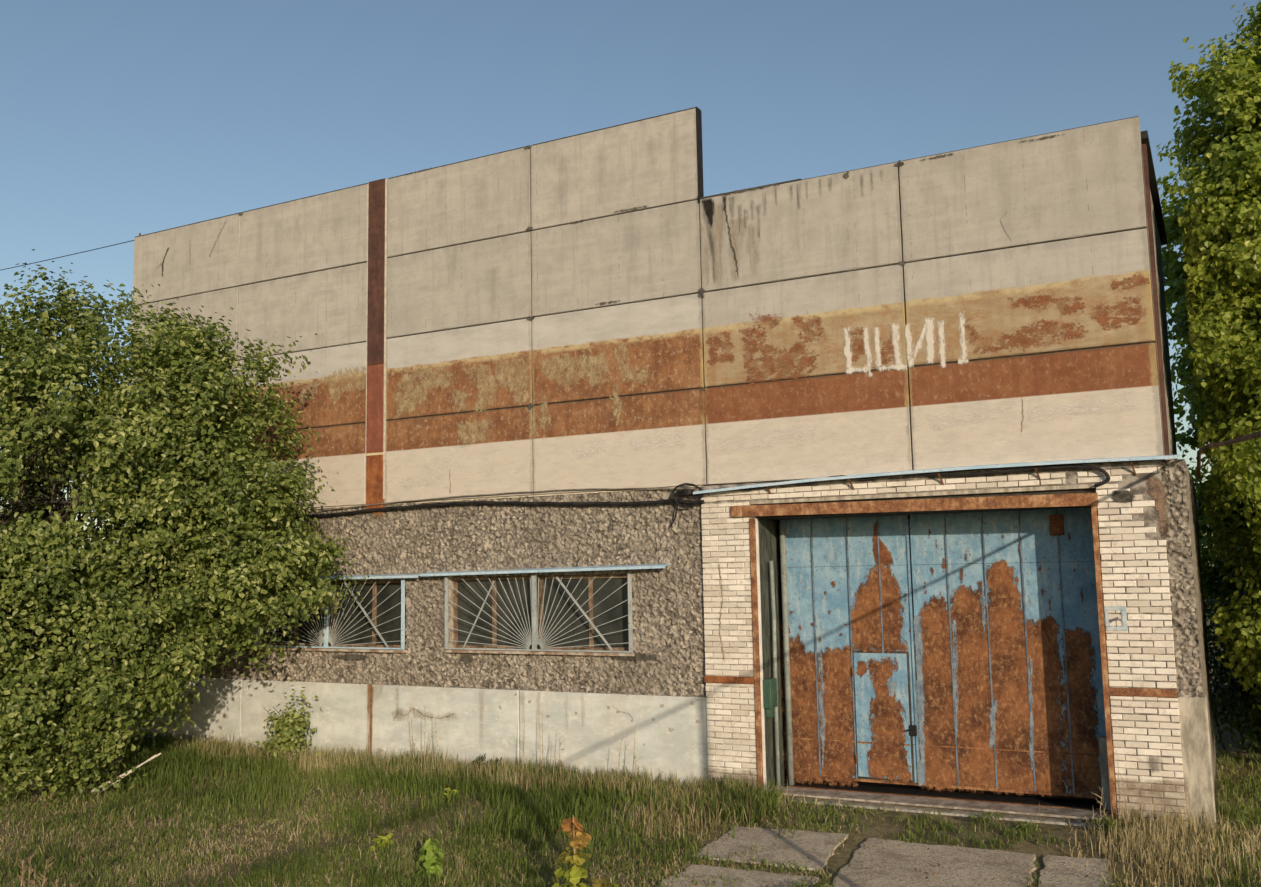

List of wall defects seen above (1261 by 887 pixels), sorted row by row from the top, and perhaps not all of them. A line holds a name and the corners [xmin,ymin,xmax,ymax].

damp [701,196,738,275]